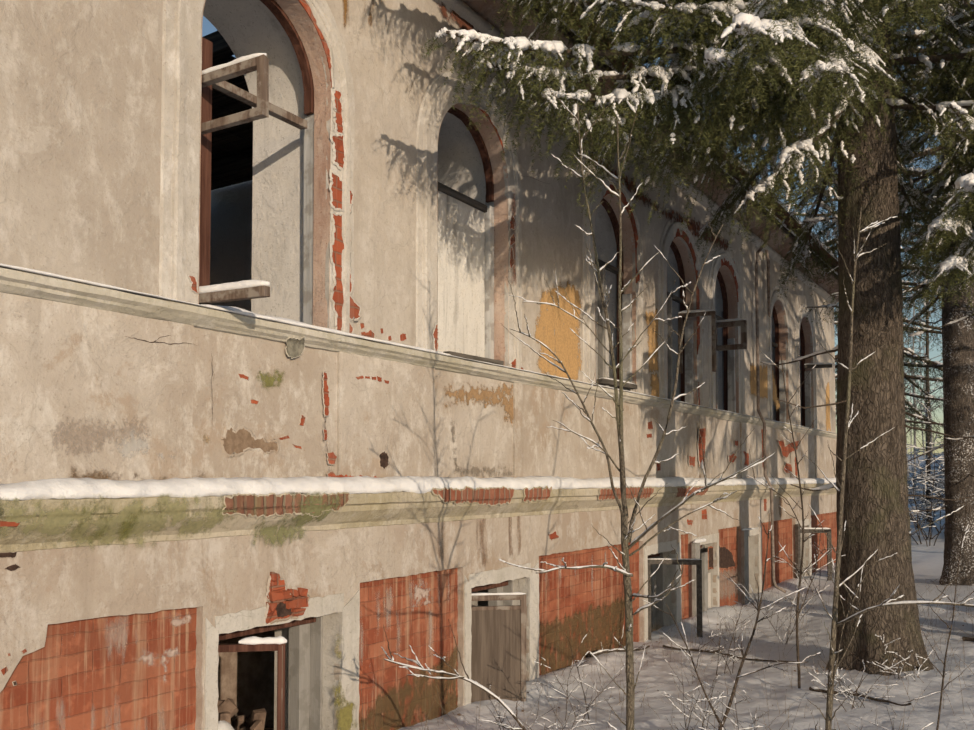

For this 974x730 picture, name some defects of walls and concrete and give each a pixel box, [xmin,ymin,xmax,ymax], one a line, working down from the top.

flaking render [440,2,481,33]
spalling [298,0,407,342]
peeling [535,282,582,380]
crack [125,335,213,427]
spalling [219,424,302,458]
spalling [327,449,389,478]
flaking render [222,492,350,519]
flaking render [431,486,552,507]
spalling [265,572,310,624]
damp [539,598,626,675]
spalling [0,648,27,686]